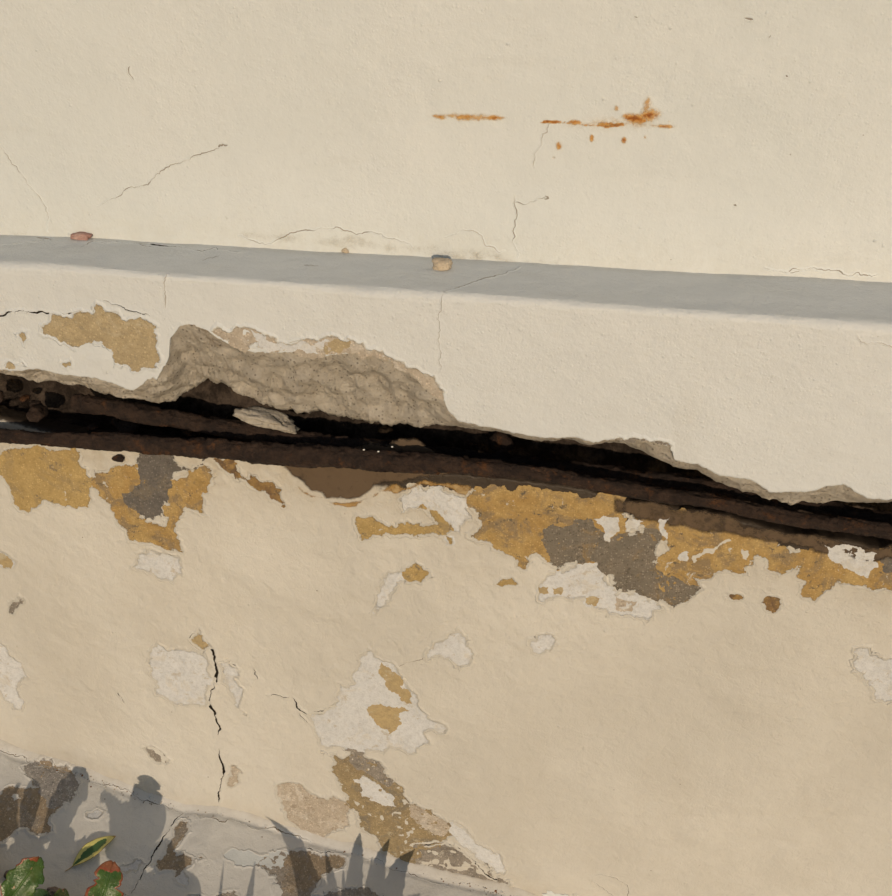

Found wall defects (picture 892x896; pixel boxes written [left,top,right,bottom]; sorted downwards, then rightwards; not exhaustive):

rust [541,99,672,141]
crack [96,140,229,208]
crack [82,225,413,259]
crack [0,307,72,320]
spalling [0,299,892,514]
peeling [0,444,293,585]
peeling [0,755,83,847]
crack [69,625,449,894]
spalling [272,646,515,888]
peeling [151,817,242,896]
peeling [255,847,387,896]
crack [412,822,507,882]